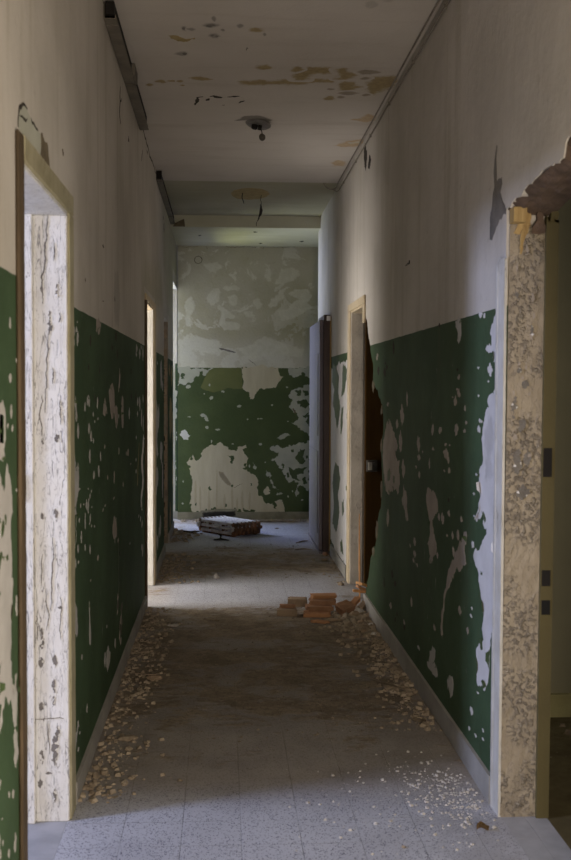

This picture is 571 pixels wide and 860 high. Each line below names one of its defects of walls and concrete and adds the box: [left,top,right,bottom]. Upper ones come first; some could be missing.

peeling [18,106,50,167]
crack [194,95,244,105]
water stain [232,63,401,101]
peeling [274,285,316,324]
peeling [477,312,496,408]
peeling [75,368,145,567]
peeling [156,322,310,583]
spalling [416,374,467,479]
peeling [0,400,20,768]
peeling [426,463,494,694]
peeling [417,645,453,698]